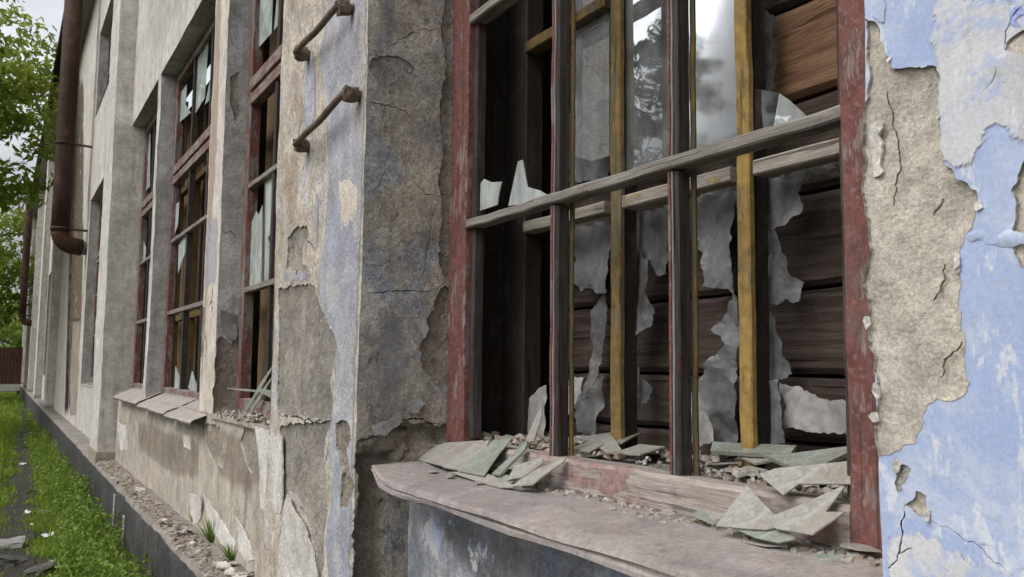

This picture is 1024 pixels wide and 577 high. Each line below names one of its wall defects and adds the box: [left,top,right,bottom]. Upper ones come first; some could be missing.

crack [887,92,902,205]
crack [364,183,443,294]
flaking render [861,0,1024,491]
peeling [201,0,447,577]
crack [932,264,946,301]
crack [940,341,963,378]
flaking render [117,422,128,451]
flaking render [182,434,191,450]
flaking render [188,493,255,563]
crack [888,504,911,577]
peeling [886,491,1024,577]
crack [930,519,1008,573]